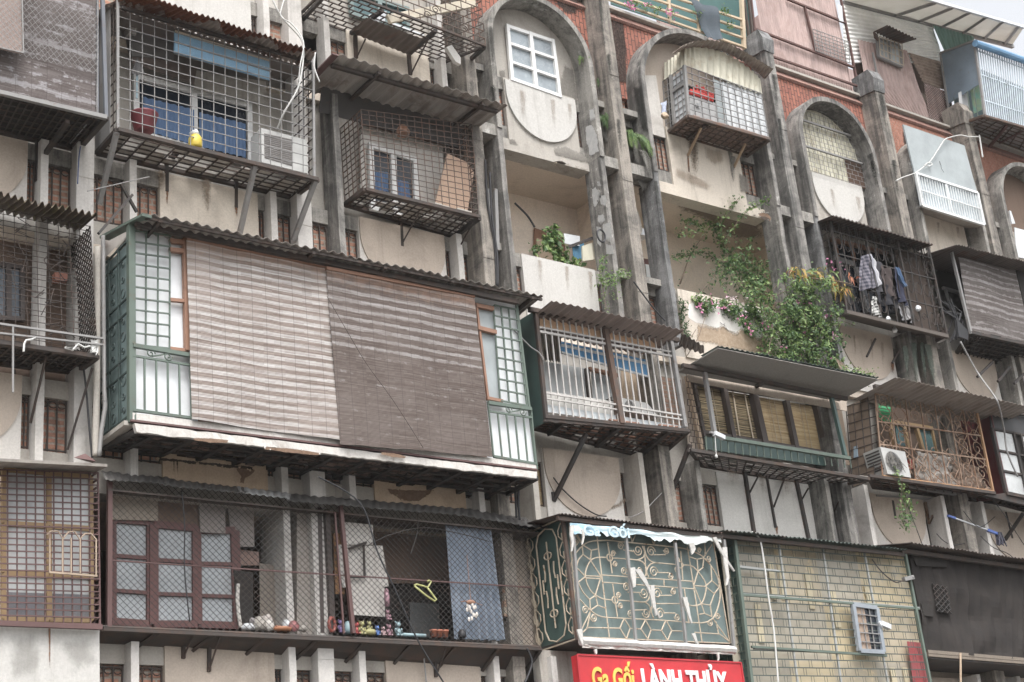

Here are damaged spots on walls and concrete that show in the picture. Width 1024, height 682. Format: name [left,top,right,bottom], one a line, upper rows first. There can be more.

peeling [585,108,599,156]
peeling [157,457,255,483]